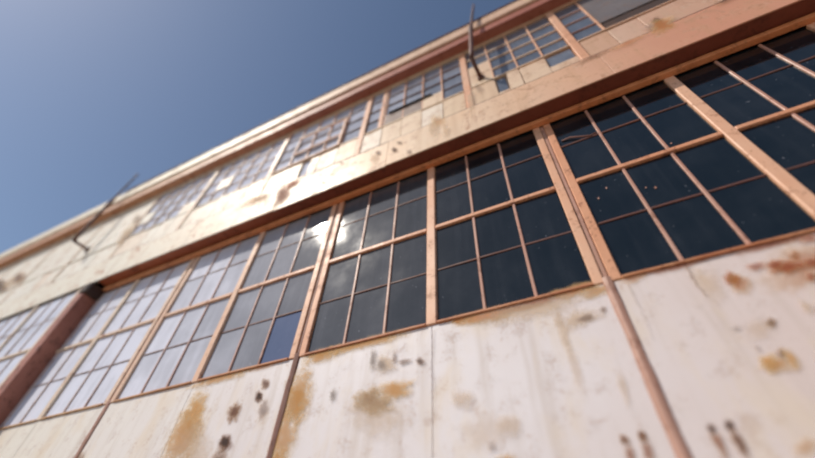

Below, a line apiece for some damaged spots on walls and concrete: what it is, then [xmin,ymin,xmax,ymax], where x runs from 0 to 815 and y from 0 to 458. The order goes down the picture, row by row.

rust [652,17,673,32]
rust [750,253,815,280]
rust [725,272,744,287]
rust [760,349,797,370]
rust [620,435,634,458]
rust [638,431,653,458]
rust [707,420,747,458]